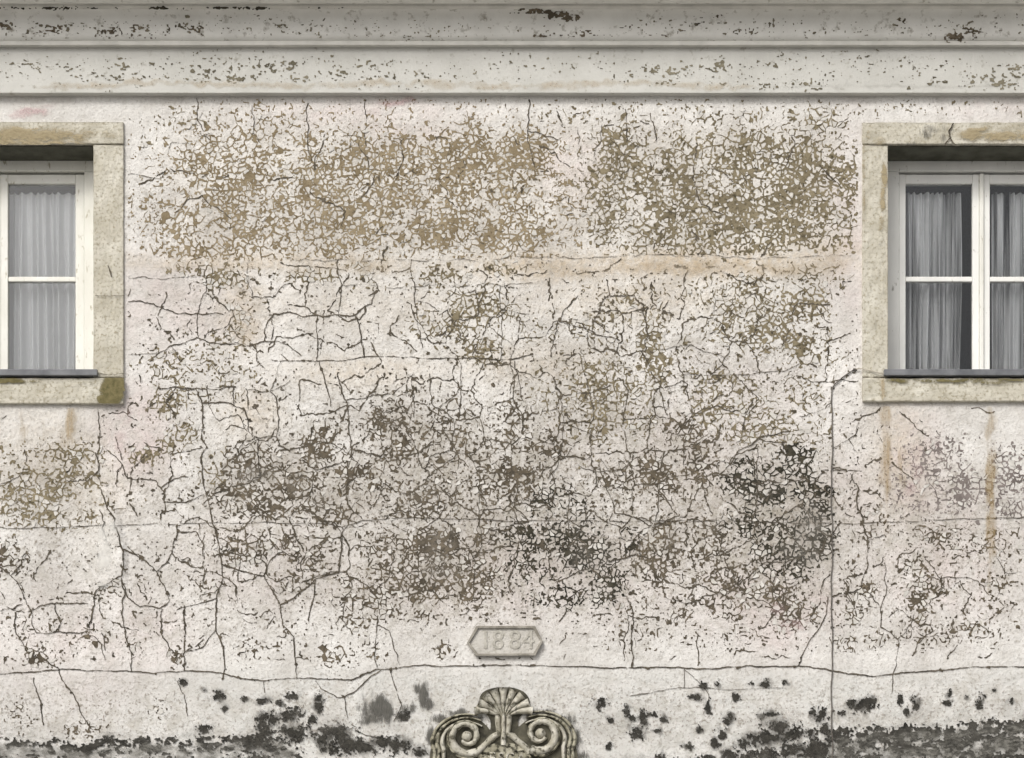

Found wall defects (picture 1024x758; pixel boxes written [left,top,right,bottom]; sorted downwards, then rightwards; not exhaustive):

spalling [0,14,471,41]
spalling [0,49,483,92]
spalling [640,52,842,93]
spalling [841,49,1024,119]
crack [128,98,203,179]
crack [304,103,312,161]
crack [527,99,558,167]
peeling [0,99,1024,676]
crack [0,254,1024,738]
water stain [0,689,428,758]
water stain [588,697,671,741]
water stain [655,680,1024,758]